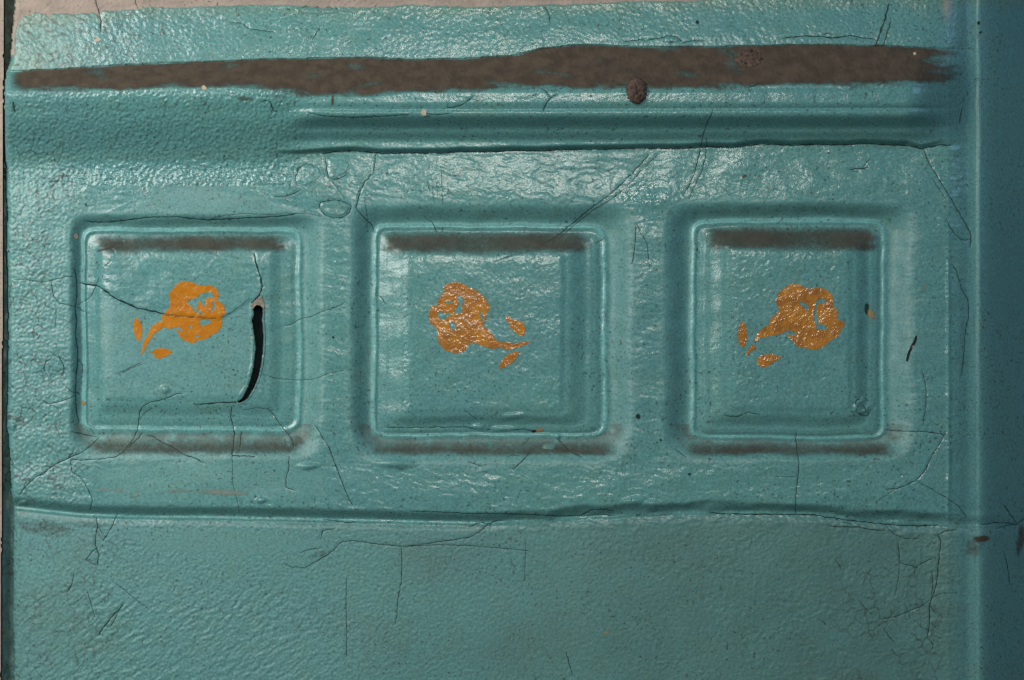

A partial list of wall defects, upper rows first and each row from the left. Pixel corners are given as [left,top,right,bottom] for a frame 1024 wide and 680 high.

crack [16,254,342,634]
crack [712,369,1024,648]